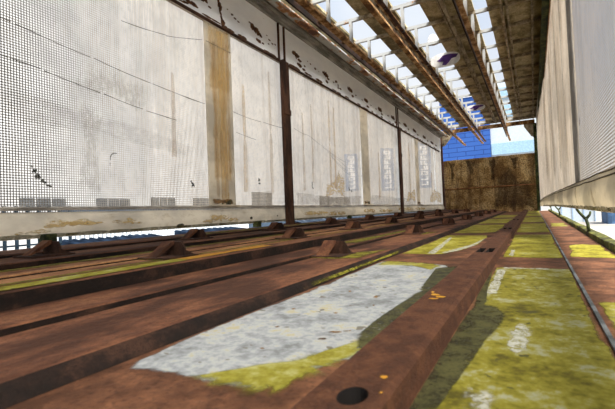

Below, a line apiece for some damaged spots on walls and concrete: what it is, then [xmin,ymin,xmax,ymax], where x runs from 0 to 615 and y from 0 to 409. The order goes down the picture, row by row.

peeling [292,51,437,146]